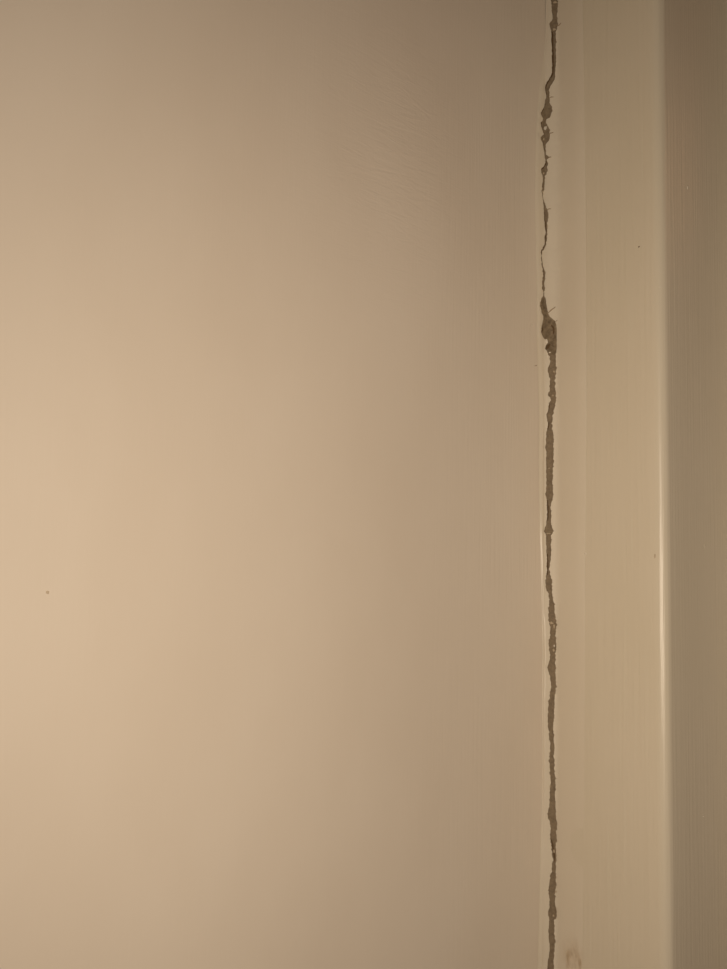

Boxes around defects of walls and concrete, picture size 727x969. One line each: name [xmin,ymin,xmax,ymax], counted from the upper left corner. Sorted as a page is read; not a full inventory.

crack [541,0,561,969]